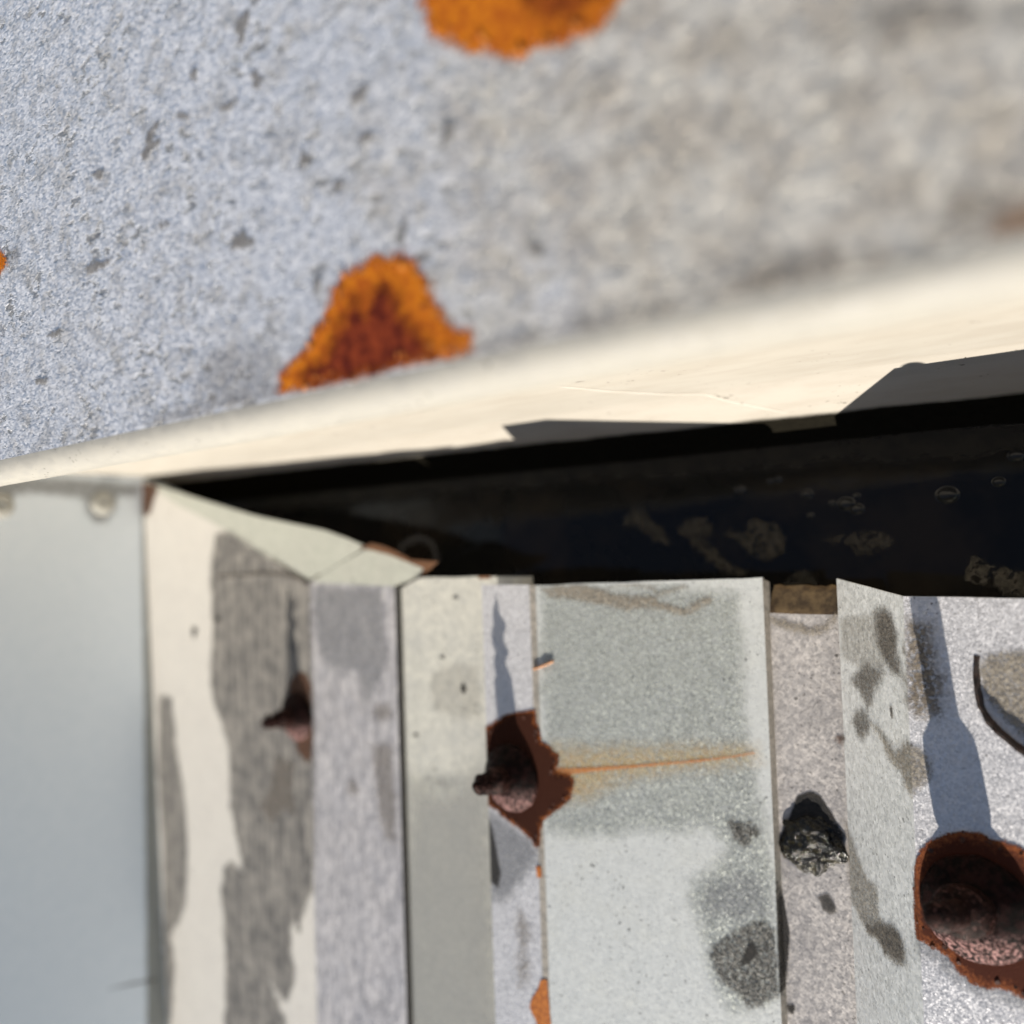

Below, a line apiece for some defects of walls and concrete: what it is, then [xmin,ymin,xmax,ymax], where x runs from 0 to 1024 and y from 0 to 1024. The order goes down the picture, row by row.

corrosion [417,0,620,67]
corrosion [275,249,475,395]
corrosion [261,671,313,821]
corrosion [486,710,754,848]
damp [545,589,770,1007]
damp [851,666,931,794]
corrosion [911,830,1024,1004]
corrosion [530,980,551,1024]